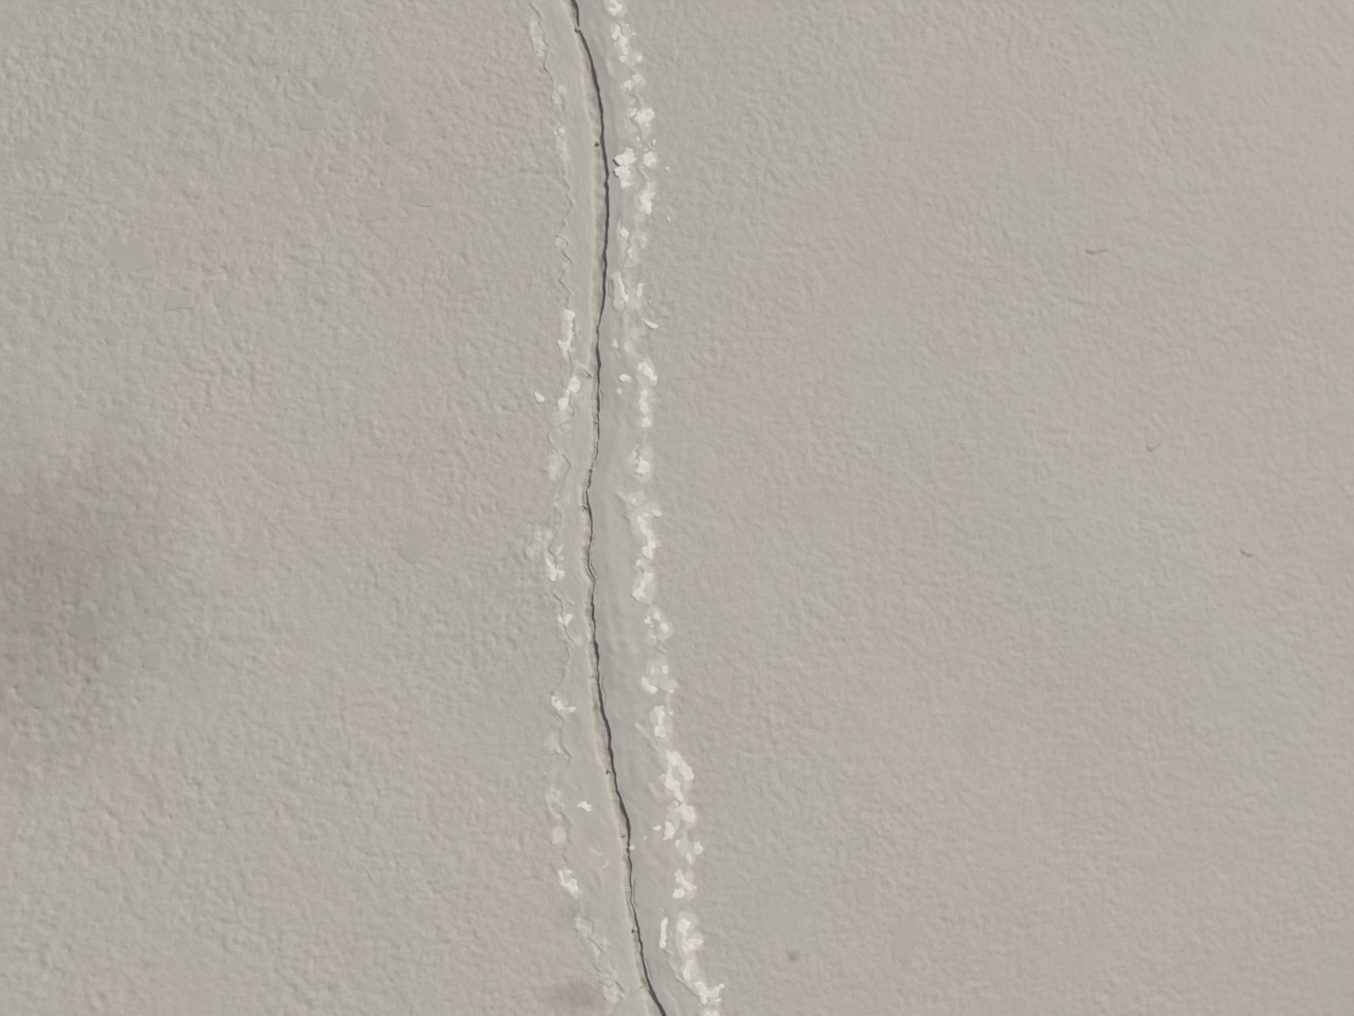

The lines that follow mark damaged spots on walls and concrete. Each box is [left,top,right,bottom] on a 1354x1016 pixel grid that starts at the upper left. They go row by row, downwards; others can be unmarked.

crack [562,0,666,1016]